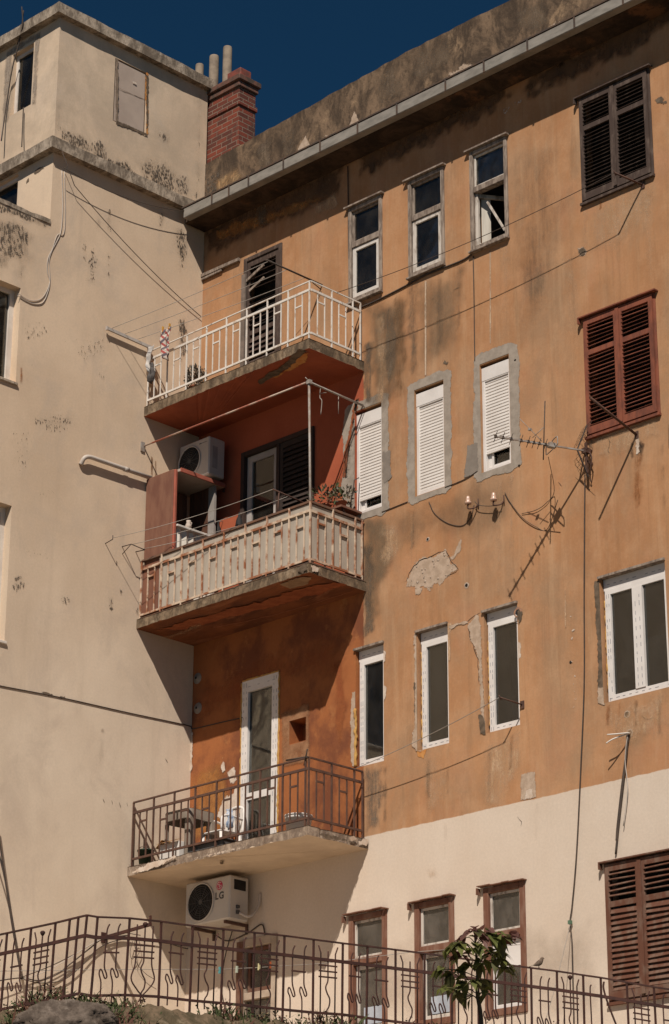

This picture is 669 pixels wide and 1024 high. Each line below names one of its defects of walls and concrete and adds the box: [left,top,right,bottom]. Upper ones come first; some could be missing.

damp [361,11,669,174]
damp [60,127,240,196]
damp [0,205,45,266]
spalling [406,540,462,595]
spalling [412,633,426,759]
spalling [448,613,486,734]
peeling [132,856,176,873]
spalling [319,833,369,846]